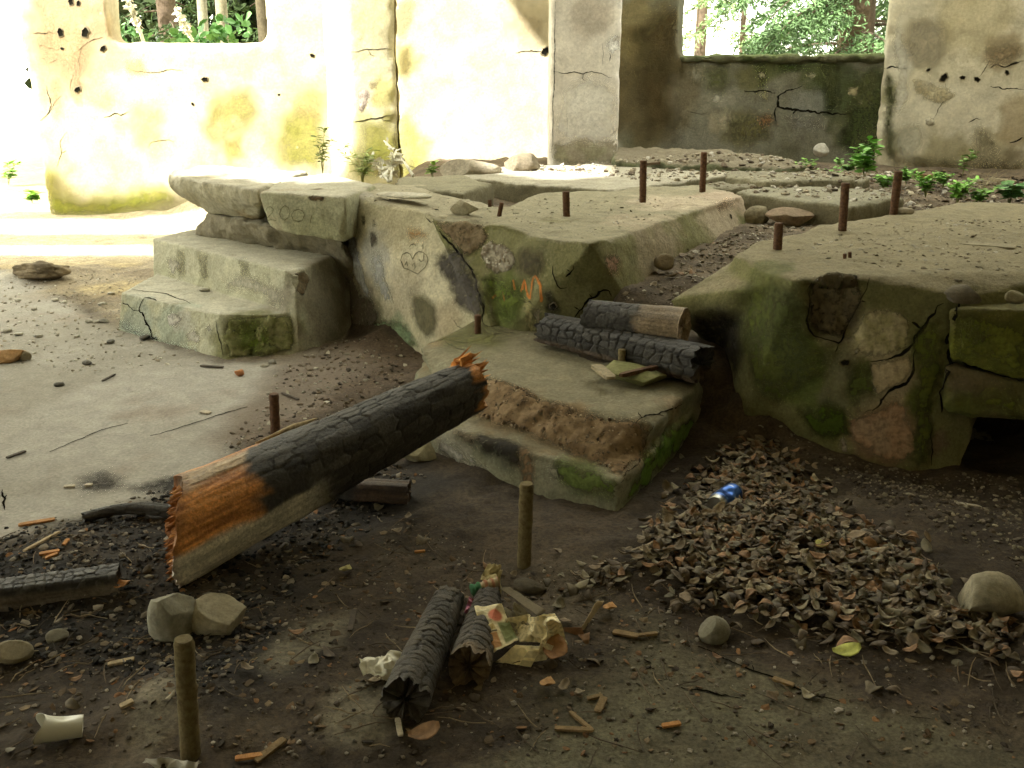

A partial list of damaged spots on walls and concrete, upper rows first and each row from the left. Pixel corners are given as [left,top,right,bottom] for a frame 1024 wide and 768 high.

crack [518,2,611,146]
crack [745,86,850,121]
crack [123,289,191,341]
water stain [693,314,739,375]
flaking render [809,272,911,394]
crack [805,280,1024,466]